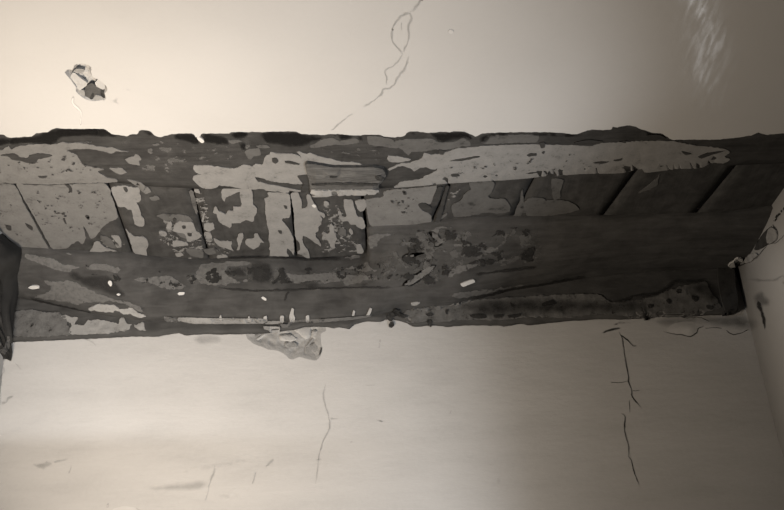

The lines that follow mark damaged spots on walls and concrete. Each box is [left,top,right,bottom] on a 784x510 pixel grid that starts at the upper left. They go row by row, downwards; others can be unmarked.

spalling [65,63,107,101]
peeling [0,129,730,313]
spalling [386,308,408,328]
flaking render [246,327,326,360]
crack [604,328,639,482]